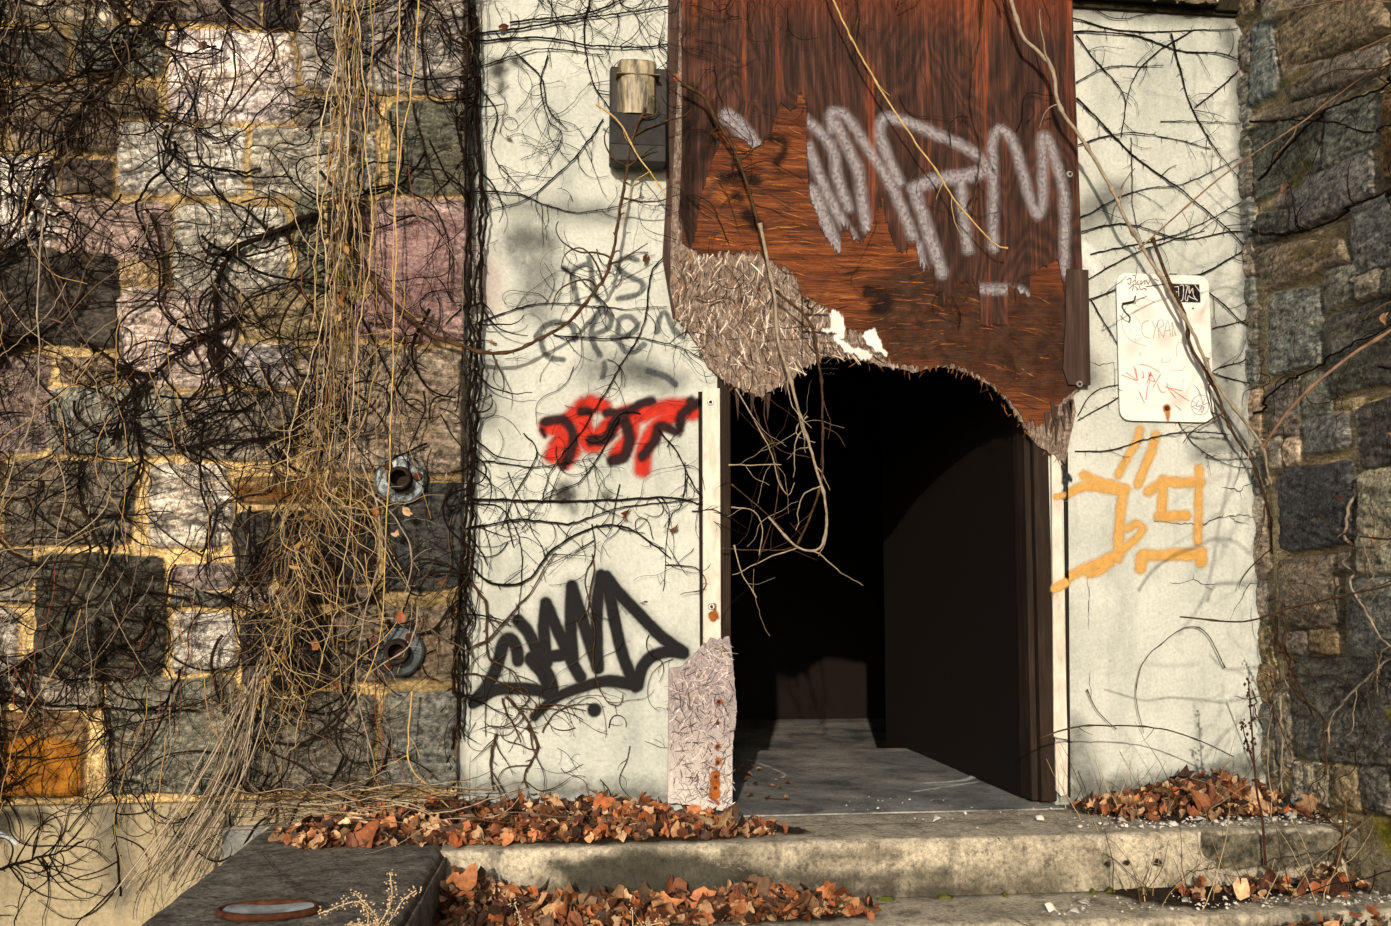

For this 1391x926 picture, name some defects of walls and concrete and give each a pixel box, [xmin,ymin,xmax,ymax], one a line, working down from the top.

peeling [822,310,888,361]
rust [709,744,722,805]